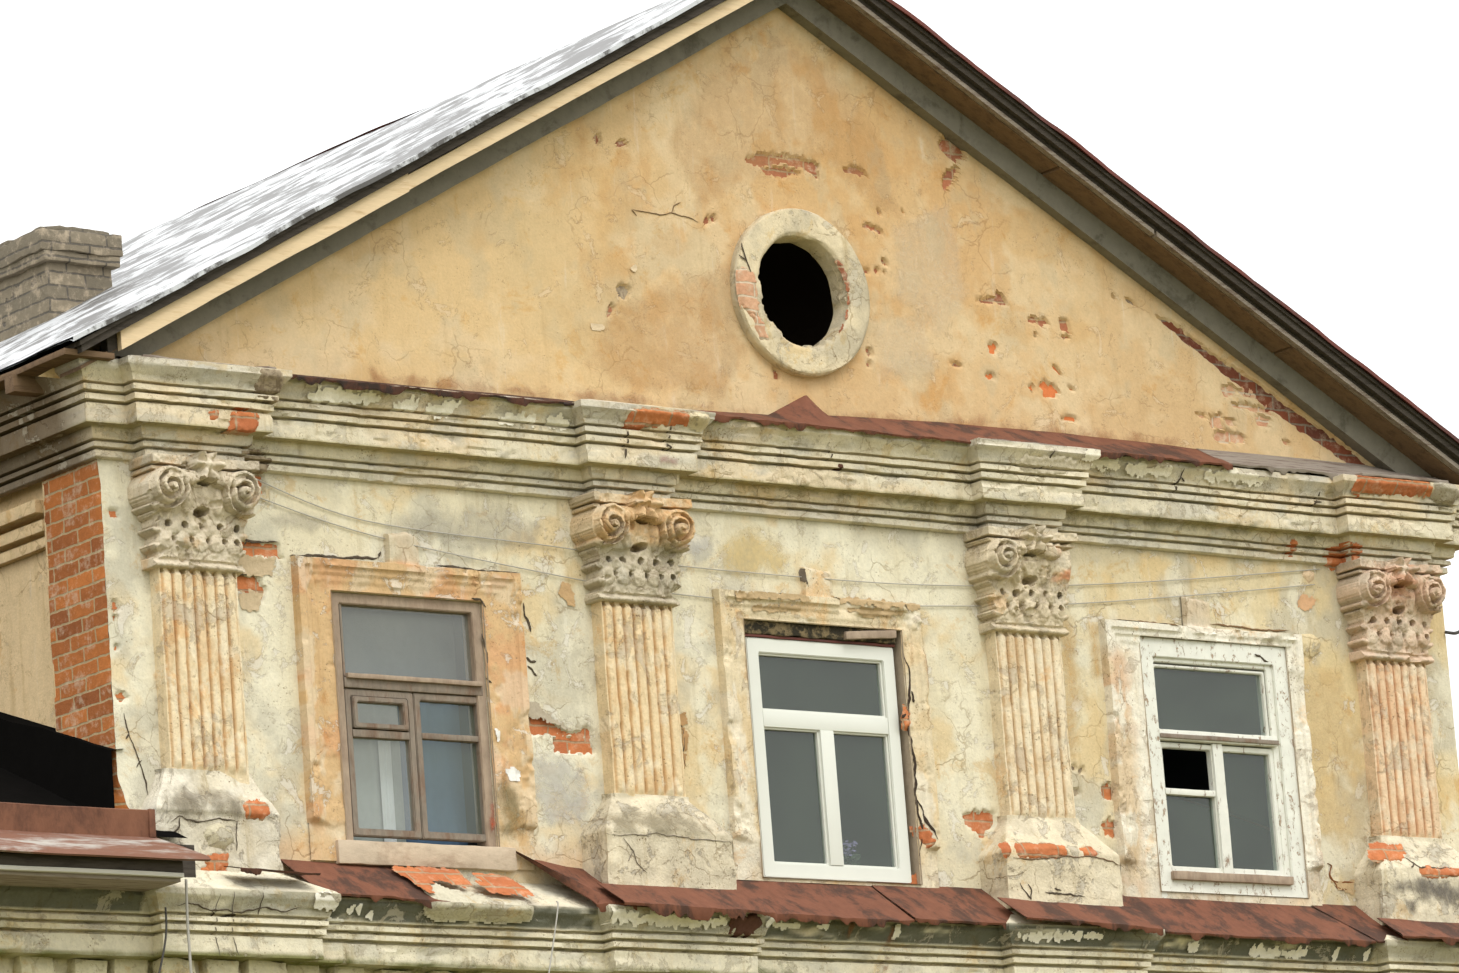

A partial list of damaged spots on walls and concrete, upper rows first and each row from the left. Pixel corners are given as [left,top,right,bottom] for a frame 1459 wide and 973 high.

crack [632,202,696,221]
peeling [307,385,462,420]
peeling [498,411,569,431]
spalling [621,407,690,431]
flaking render [1161,320,1433,499]
flaking render [1015,449,1173,478]
peeling [237,542,280,612]
spalling [529,702,592,755]
spalling [962,810,1114,859]
spalling [1367,841,1406,863]
flaking render [392,865,534,898]
spalling [1419,865,1459,879]